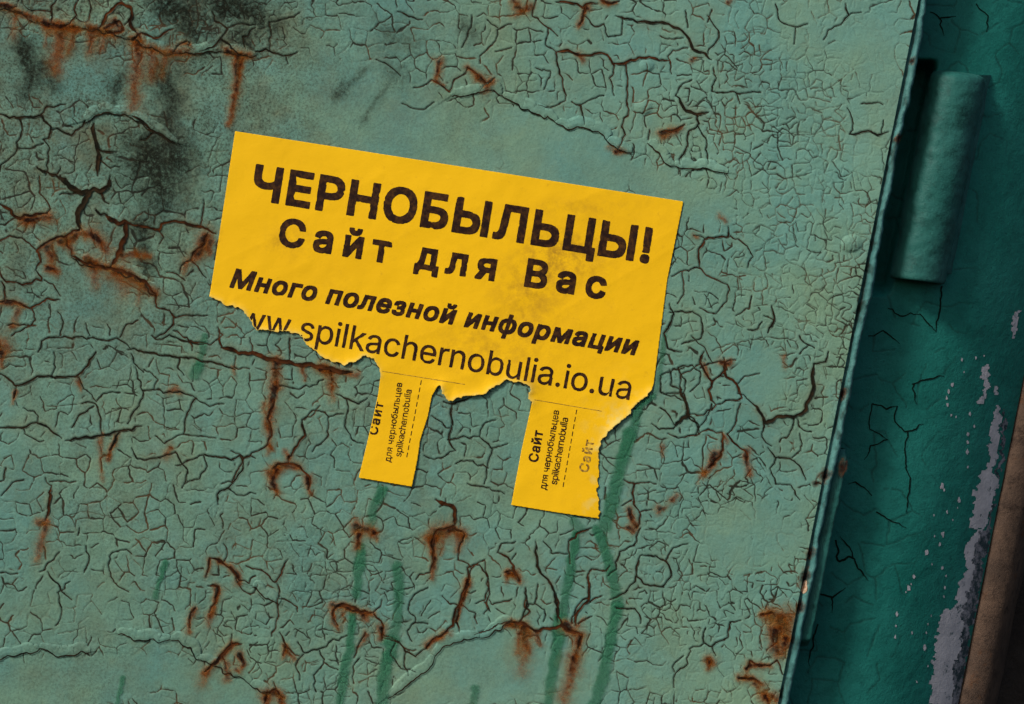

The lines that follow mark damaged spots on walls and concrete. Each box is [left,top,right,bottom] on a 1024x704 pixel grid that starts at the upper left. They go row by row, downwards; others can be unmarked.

corrosion [0,2,191,108]
crack [12,0,299,63]
corrosion [224,47,252,126]
crack [378,0,756,163]
crack [0,104,368,502]
corrosion [263,356,312,494]
crack [652,227,829,500]
peeling [1011,310,1021,339]
crack [189,397,687,691]
corrosion [425,524,467,579]
peeling [916,355,1008,704]
corrosion [736,602,803,704]